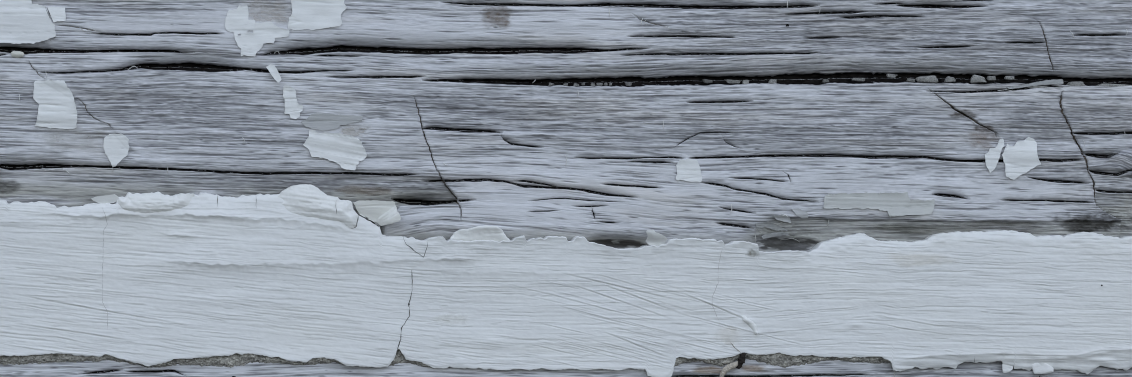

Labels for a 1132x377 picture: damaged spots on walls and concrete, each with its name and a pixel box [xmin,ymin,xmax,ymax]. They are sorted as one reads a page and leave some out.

peeling [225,0,347,57]
peeling [33,79,77,129]
peeling [266,64,303,119]
crack [0,0,1132,229]
peeling [103,133,129,167]
peeling [303,130,367,170]
peeling [984,137,1041,180]
peeling [353,200,401,226]
crack [397,240,428,349]
spalling [0,353,344,368]
spalling [389,349,432,368]
spalling [674,353,891,368]